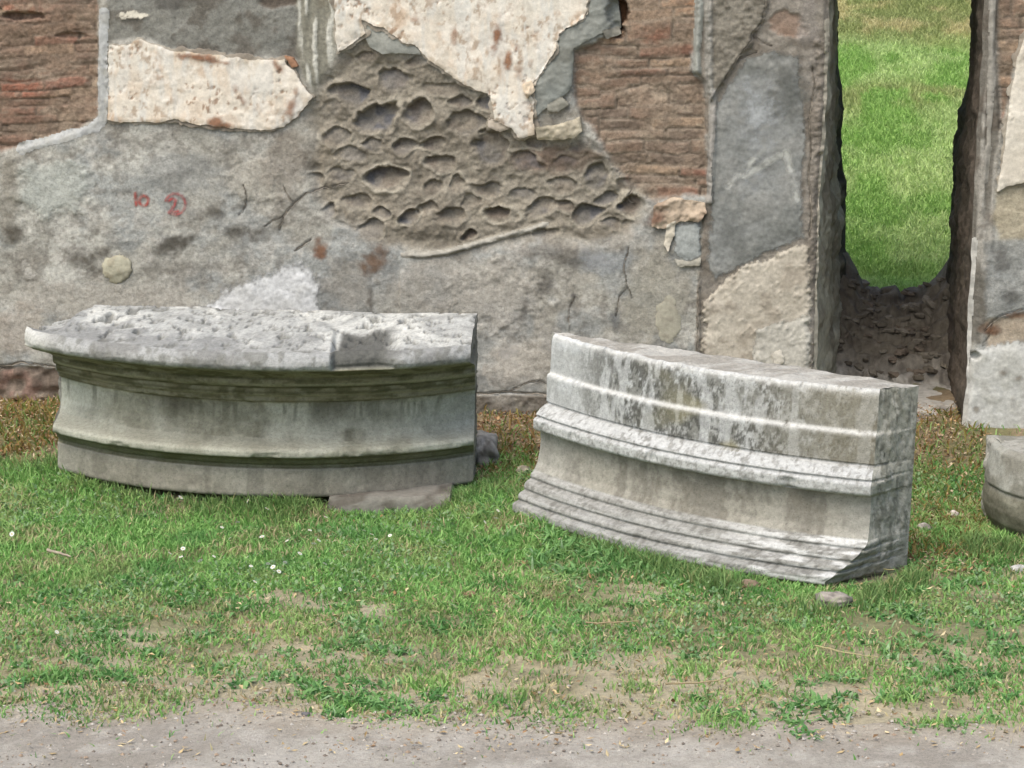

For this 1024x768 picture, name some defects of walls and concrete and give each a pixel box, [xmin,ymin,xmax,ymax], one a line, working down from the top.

crack [265,182,348,230]
spalling [0,0,813,369]
rust [315,245,326,258]